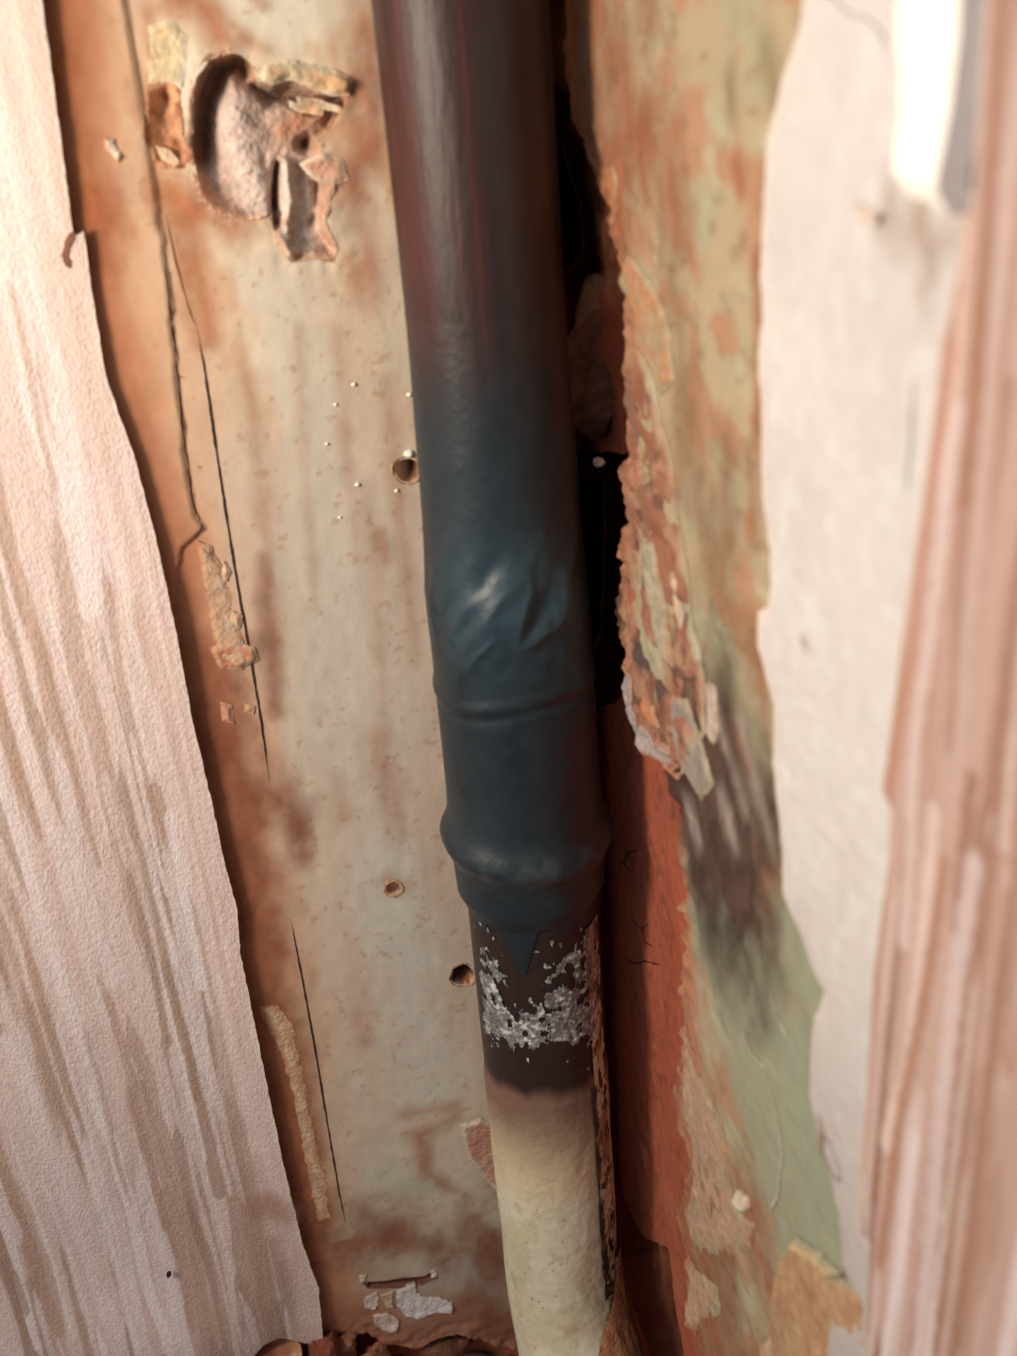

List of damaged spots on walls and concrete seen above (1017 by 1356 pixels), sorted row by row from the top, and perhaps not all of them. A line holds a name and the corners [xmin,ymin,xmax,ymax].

rust [52,43,73,96]
rust [73,164,116,241]
flaking render [144,19,354,264]
crack [165,213,270,785]
flaking render [578,253,721,800]
rust [203,658,286,1010]
damp [673,778,706,900]
damp [718,721,764,849]
flaking render [257,1005,331,1221]
rust [269,1056,329,1238]
crack [291,923,346,1223]
flaking render [760,1235,863,1356]